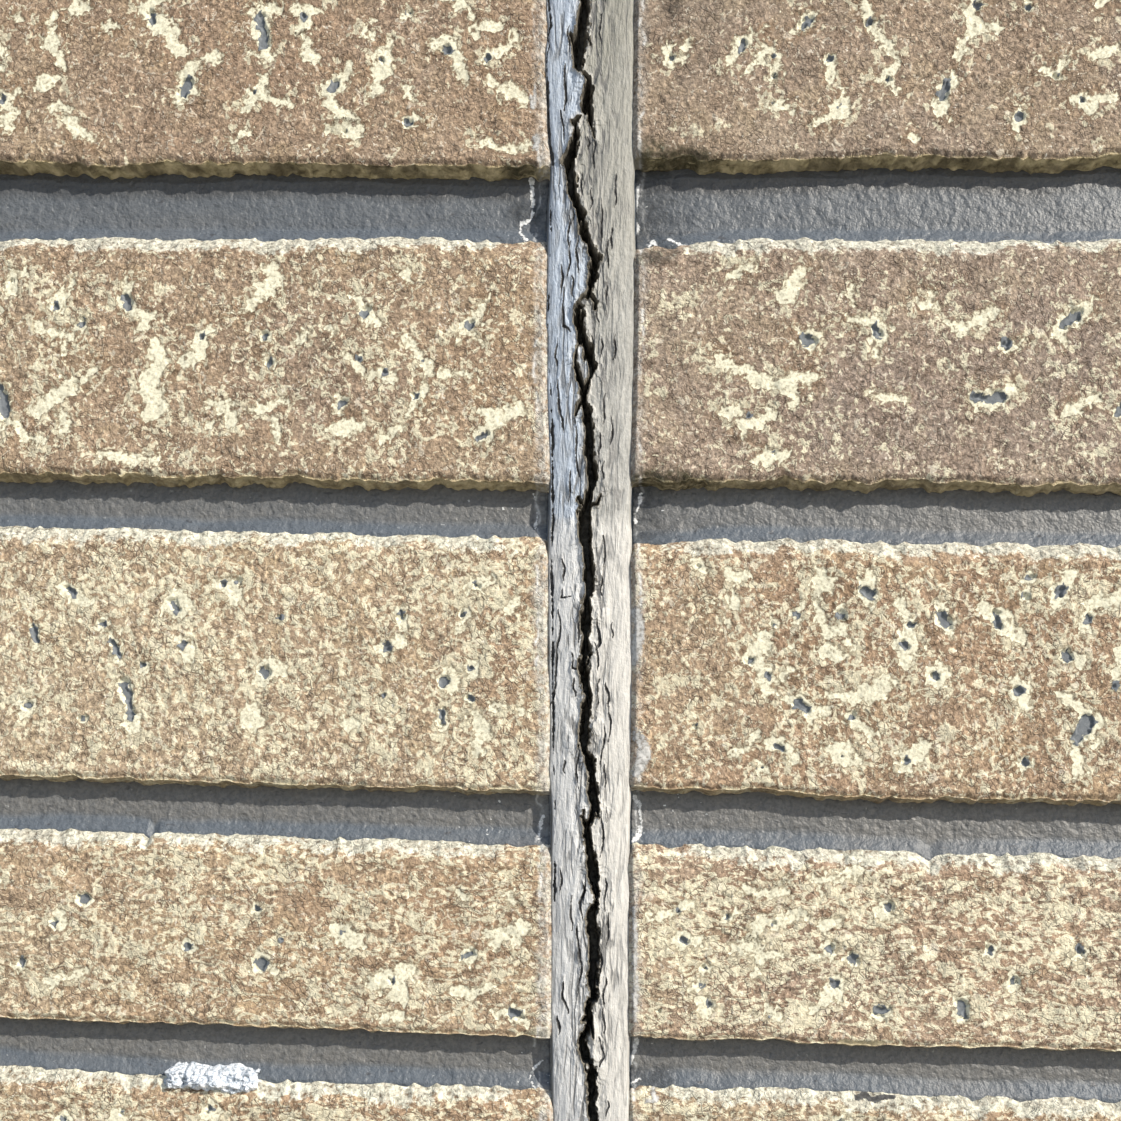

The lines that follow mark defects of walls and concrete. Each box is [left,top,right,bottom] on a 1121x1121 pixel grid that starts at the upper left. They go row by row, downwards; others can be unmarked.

crack [546,0,629,1121]